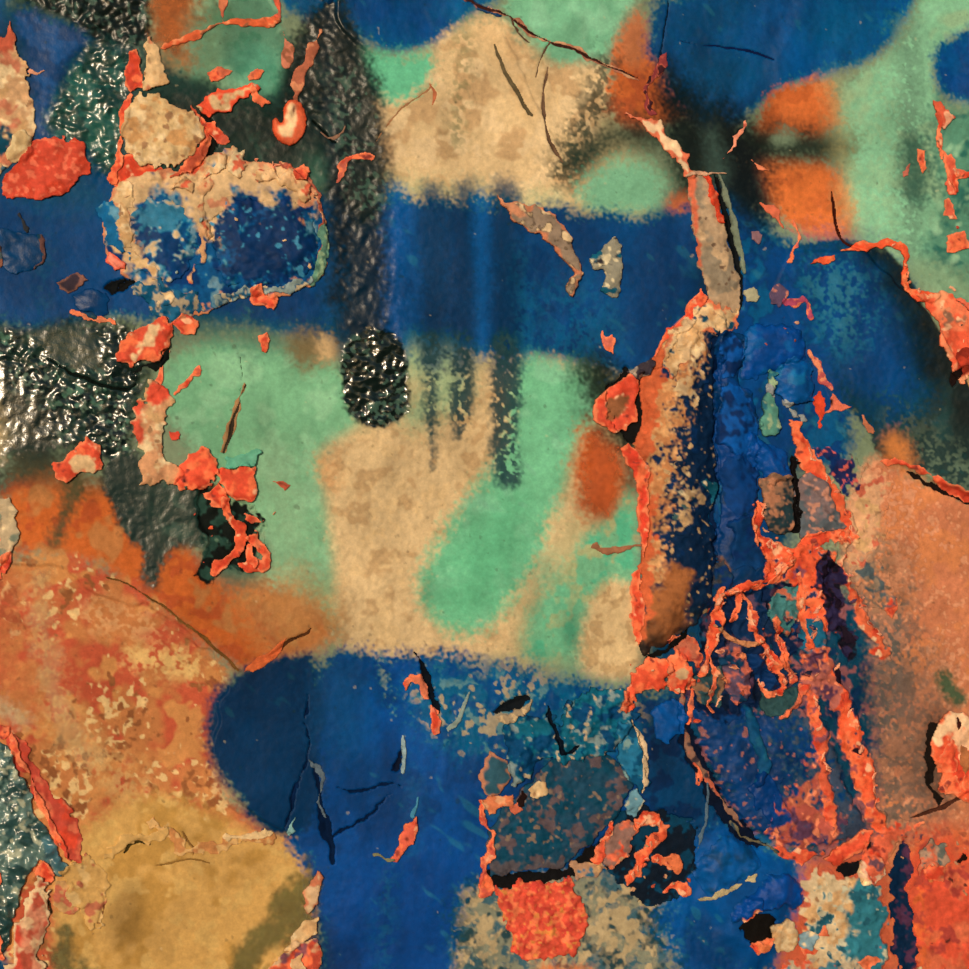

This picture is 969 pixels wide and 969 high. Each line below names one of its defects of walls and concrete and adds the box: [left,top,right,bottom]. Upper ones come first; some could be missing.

crack [160,0,281,50]
spalling [0,21,91,200]
peeling [52,29,329,585]
crack [311,120,346,143]
crack [376,84,437,141]
peeling [497,195,623,298]
crack [464,0,774,356]
peeling [810,238,969,387]
crack [106,577,311,672]
peeling [478,283,969,969]
peeling [0,725,296,969]
crack [285,697,400,865]